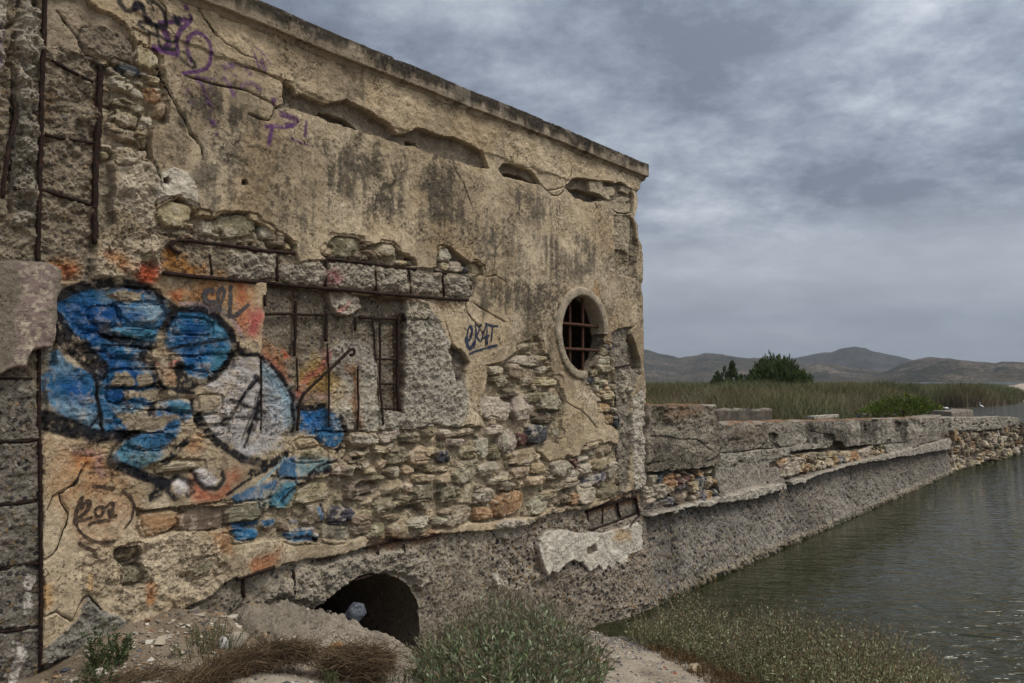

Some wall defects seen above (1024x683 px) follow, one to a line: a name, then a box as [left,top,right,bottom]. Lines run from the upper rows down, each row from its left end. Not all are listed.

rust [0,101,21,199]
rust [35,0,104,262]
crack [56,9,94,58]
spalling [0,0,160,282]
water stain [171,66,602,324]
rust [160,238,469,432]
spalling [168,239,476,437]
spalling [103,326,659,683]
rust [585,489,642,545]
spalling [768,432,872,453]